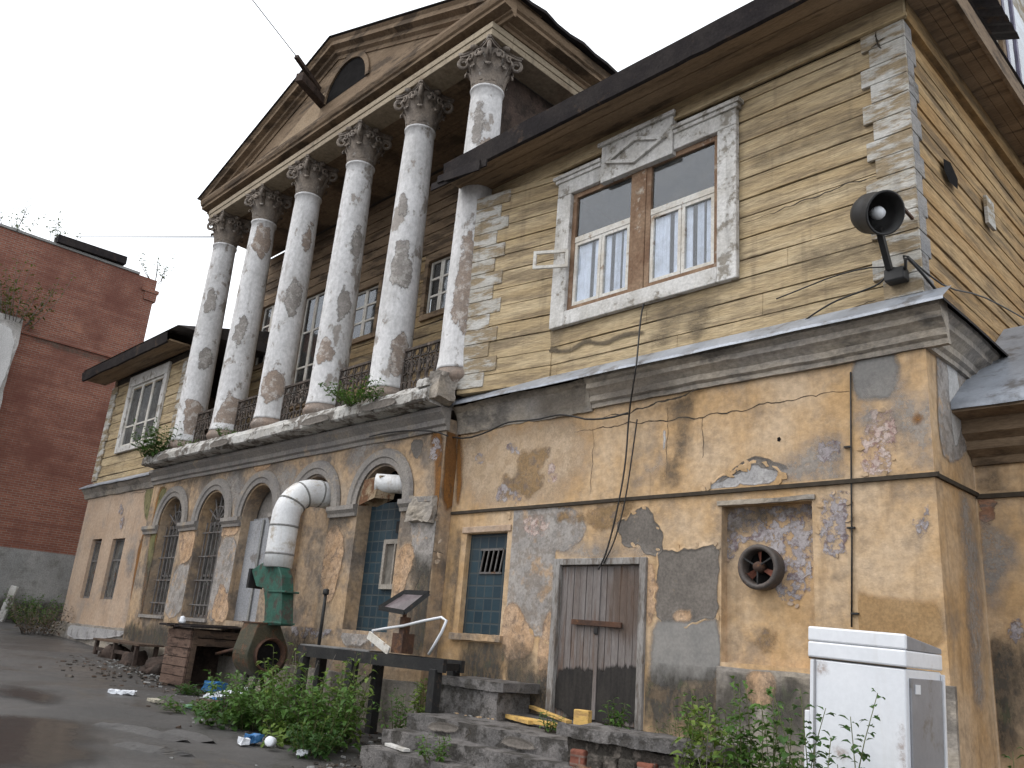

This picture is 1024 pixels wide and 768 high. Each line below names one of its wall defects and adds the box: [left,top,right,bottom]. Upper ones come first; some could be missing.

peeling [398,193,408,216]
crack [743,176,876,223]
peeling [284,279,303,317]
peeling [389,240,413,289]
peeling [450,231,474,335]
peeling [261,368,286,404]
crack [572,388,848,492]
peeling [857,408,898,477]
peeling [496,484,558,676]
flaking render [615,490,854,628]